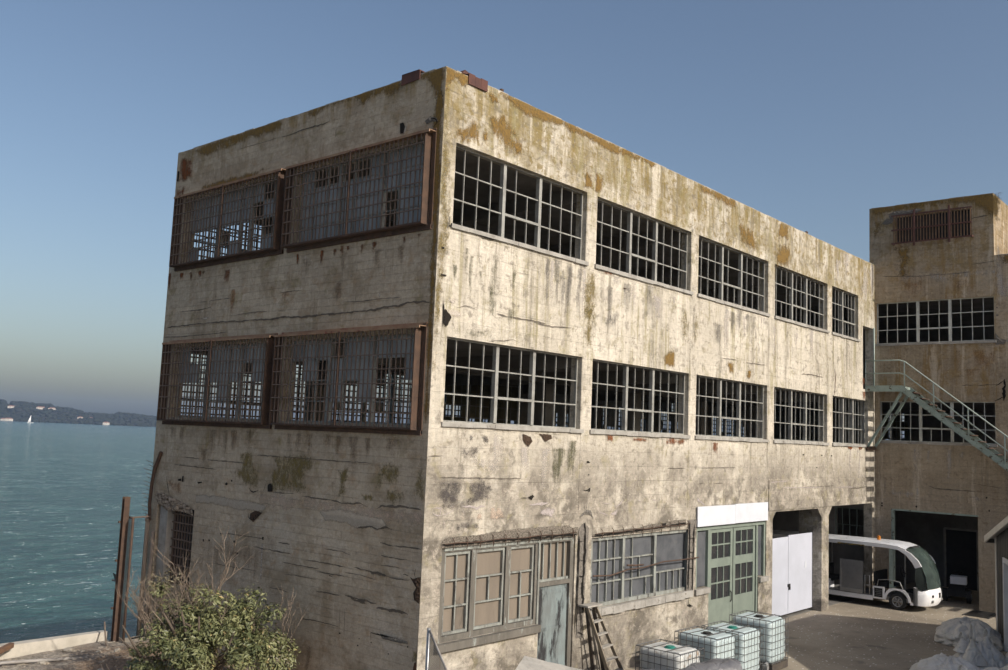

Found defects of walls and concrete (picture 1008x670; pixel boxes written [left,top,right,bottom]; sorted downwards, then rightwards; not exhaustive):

rust [177,159,192,196]
crack [494,314,569,342]
spalling [523,434,552,447]